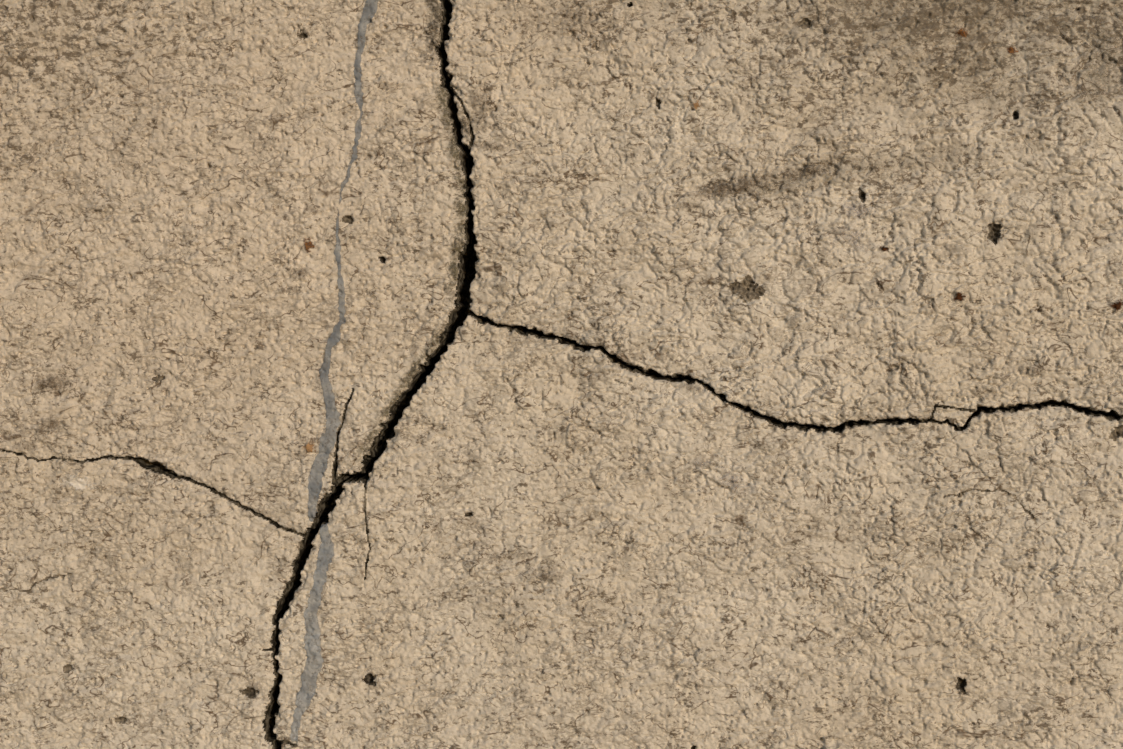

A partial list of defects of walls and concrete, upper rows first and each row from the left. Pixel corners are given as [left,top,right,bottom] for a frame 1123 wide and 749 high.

crack [0,0,478,749]
crack [468,310,1123,433]
crack [943,487,1037,525]